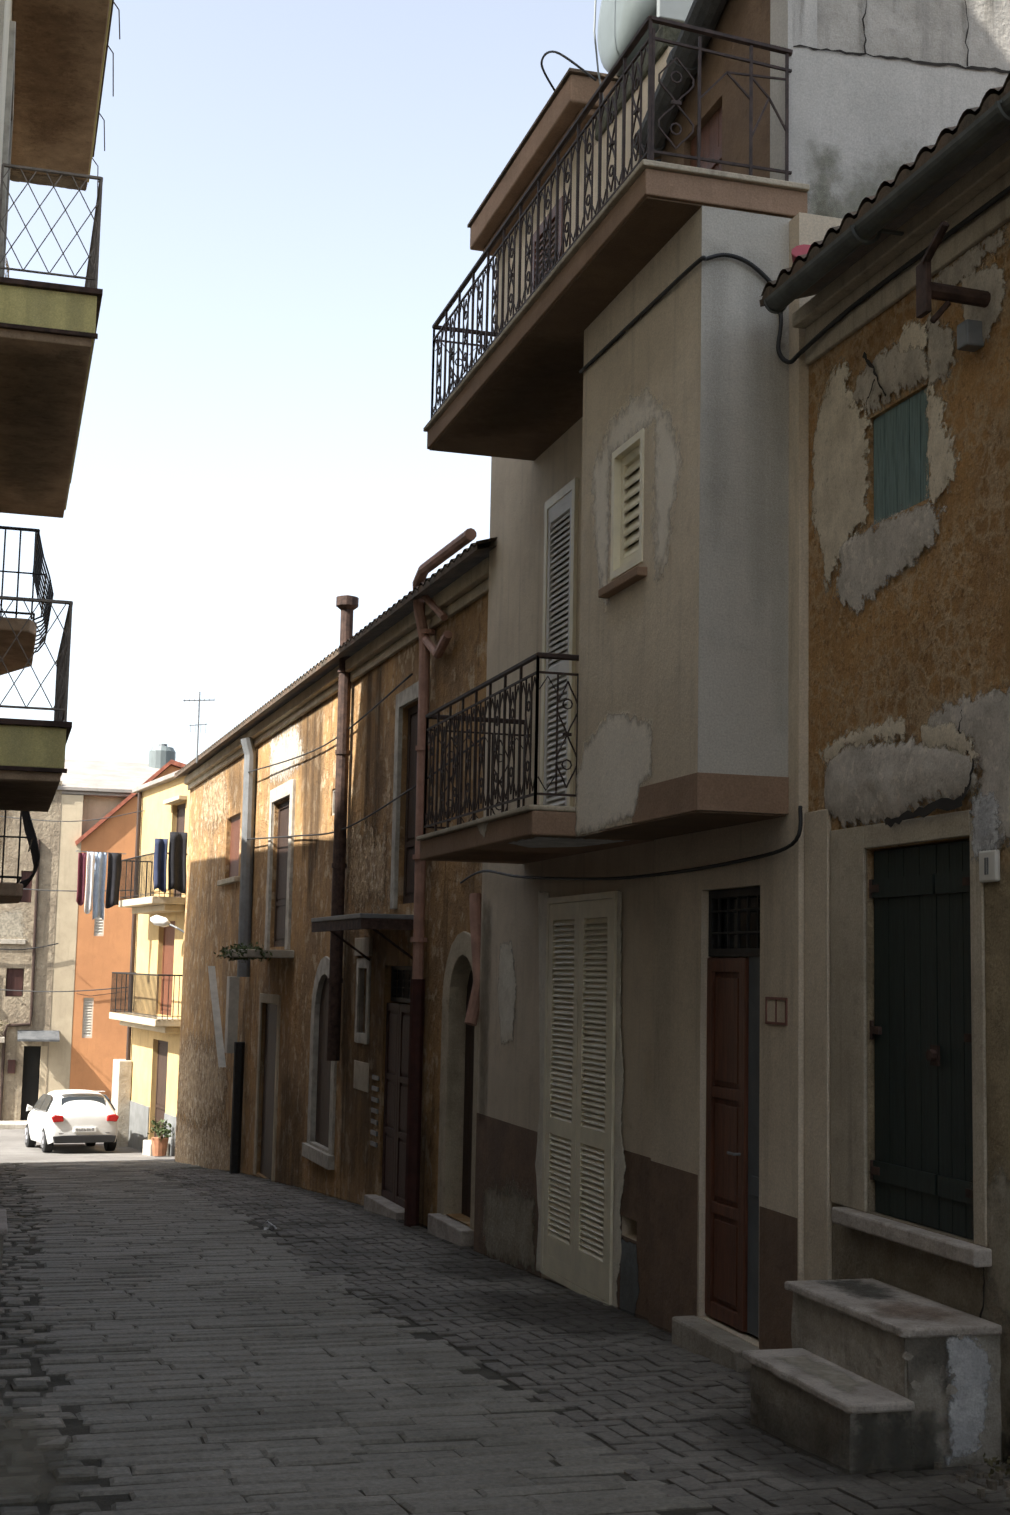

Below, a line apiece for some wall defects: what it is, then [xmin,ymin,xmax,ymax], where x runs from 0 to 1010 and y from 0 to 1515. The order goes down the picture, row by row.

crack [793,0,1010,73]
peeling [810,358,960,616]
spalling [819,716,1003,860]
peeling [945,1334,993,1465]